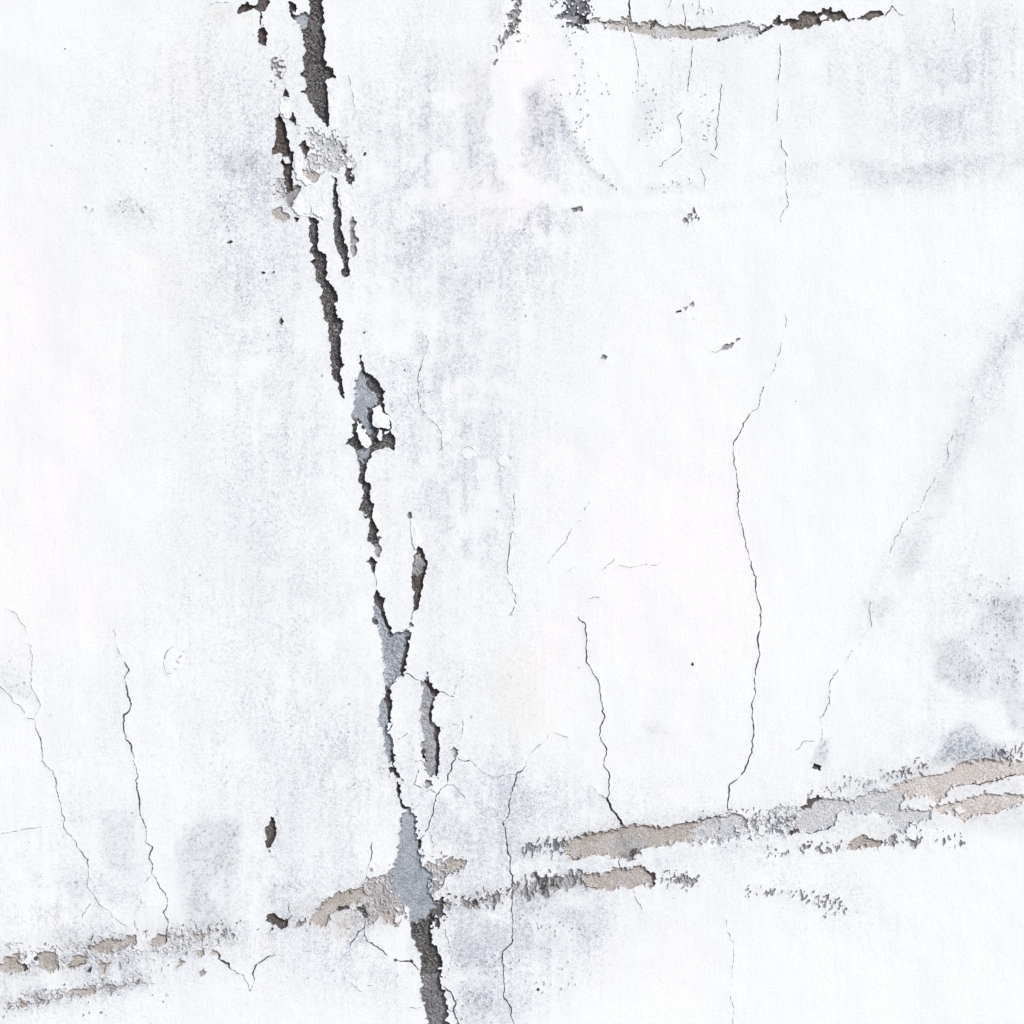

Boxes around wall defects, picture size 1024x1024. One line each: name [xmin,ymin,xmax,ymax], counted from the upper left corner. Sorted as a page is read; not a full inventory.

peeling [237,0,270,46]
peeling [550,0,903,42]
peeling [269,45,366,222]
crack [727,316,787,811]
crack [0,610,169,932]
peeling [0,919,244,1020]
peeling [265,810,281,852]
peeling [256,864,405,934]
spalling [366,512,463,793]
crack [578,597,623,825]
peeling [422,742,1024,919]